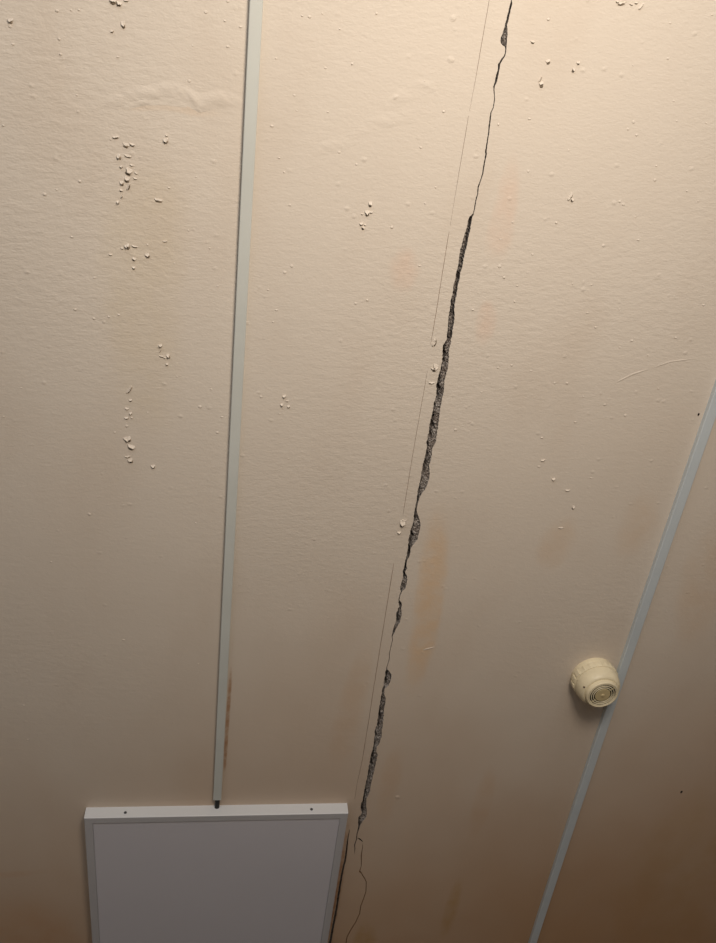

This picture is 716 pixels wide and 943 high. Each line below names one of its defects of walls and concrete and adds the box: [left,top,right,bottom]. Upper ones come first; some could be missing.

peeling [113,136,138,204]
crack [328,0,512,943]